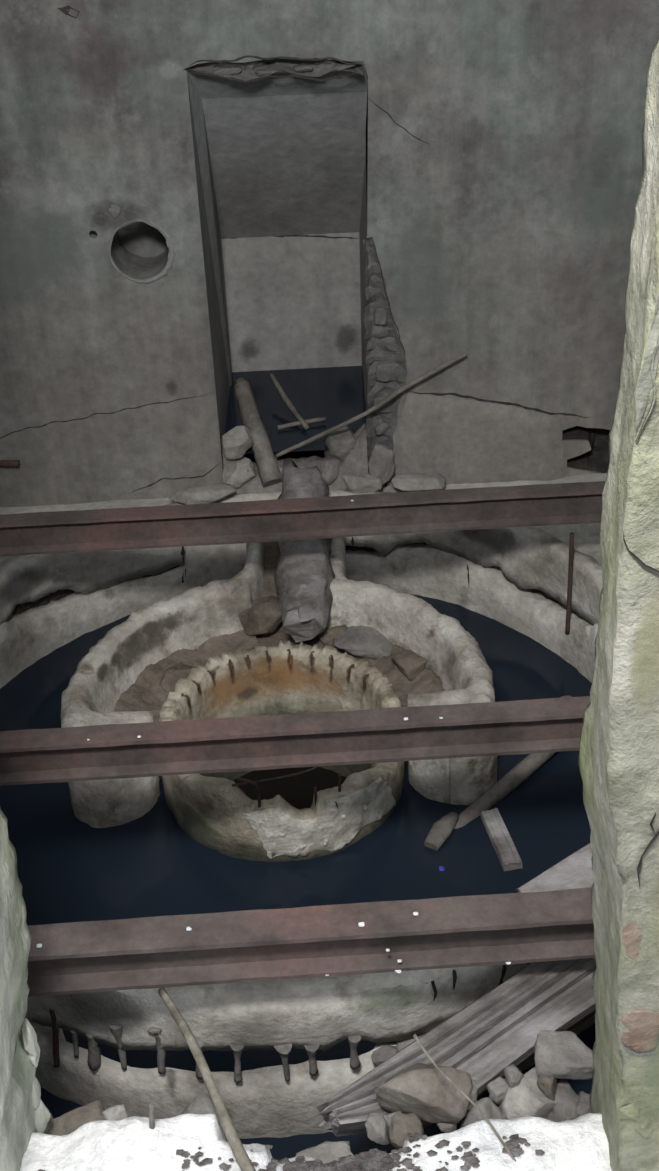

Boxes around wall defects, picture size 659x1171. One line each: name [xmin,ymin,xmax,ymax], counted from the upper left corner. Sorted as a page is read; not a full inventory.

crack [0,395,204,439]
crack [410,391,590,418]
spalling [562,426,610,473]
crack [131,463,220,493]
corrosion [181,669,215,710]
corrosion [228,655,251,682]
corrosion [310,651,334,679]
corrosion [347,664,370,690]
spalling [232,766,395,859]